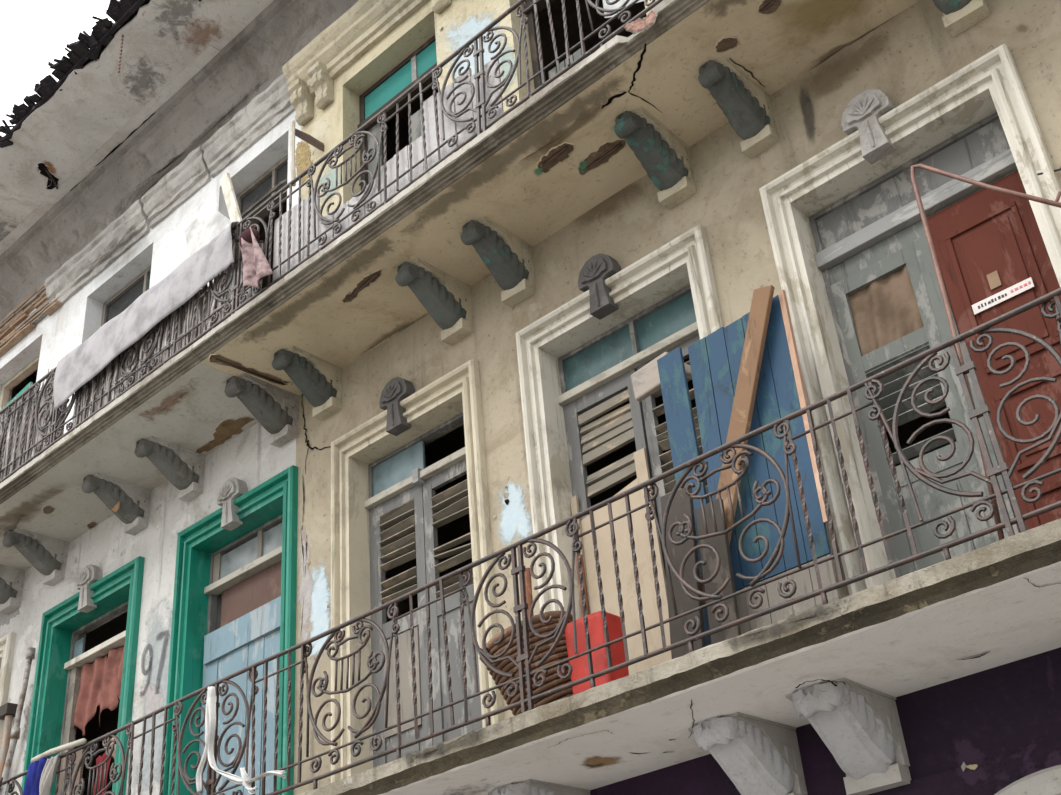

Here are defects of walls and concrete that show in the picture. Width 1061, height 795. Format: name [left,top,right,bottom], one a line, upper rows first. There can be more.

spalling [757,0,783,15]
spalling [0,0,140,148]
crack [601,43,662,113]
spalling [37,162,60,190]
spalling [535,139,627,175]
flaking render [0,283,63,357]
spalling [195,416,256,454]
crack [302,394,331,522]
peeling [493,483,532,543]